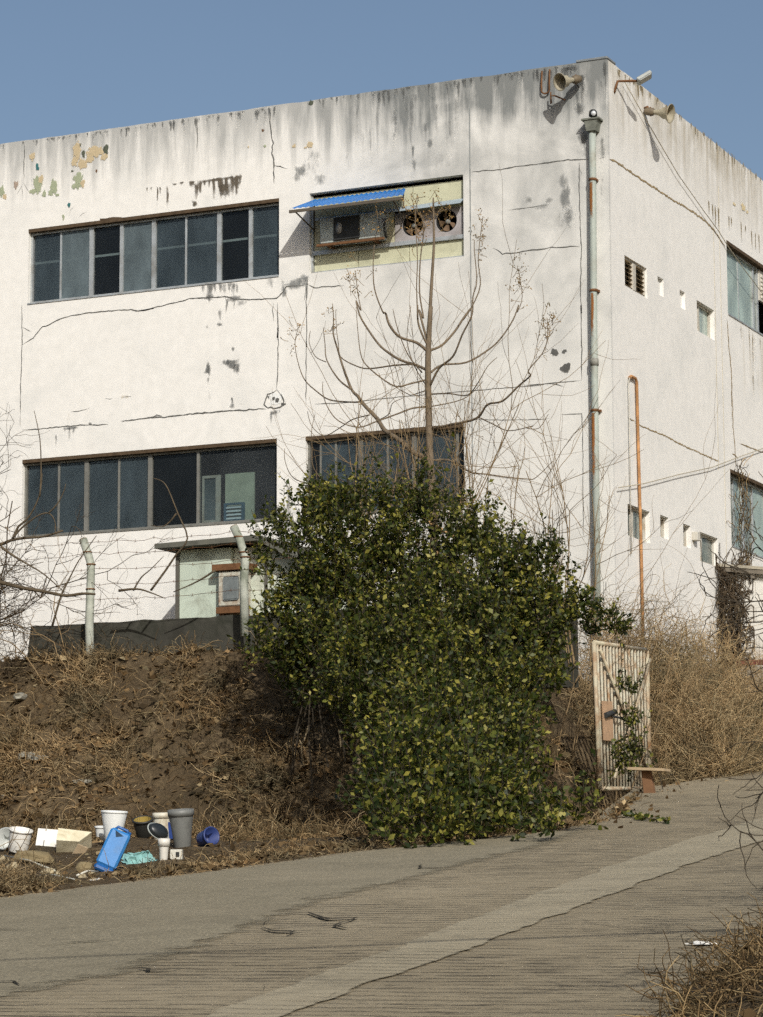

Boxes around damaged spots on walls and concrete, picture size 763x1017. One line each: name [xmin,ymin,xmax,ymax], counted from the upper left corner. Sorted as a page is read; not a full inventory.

peeling [29,153,59,197]
peeling [71,140,109,190]
crack [20,157,725,430]
crack [485,413,583,450]